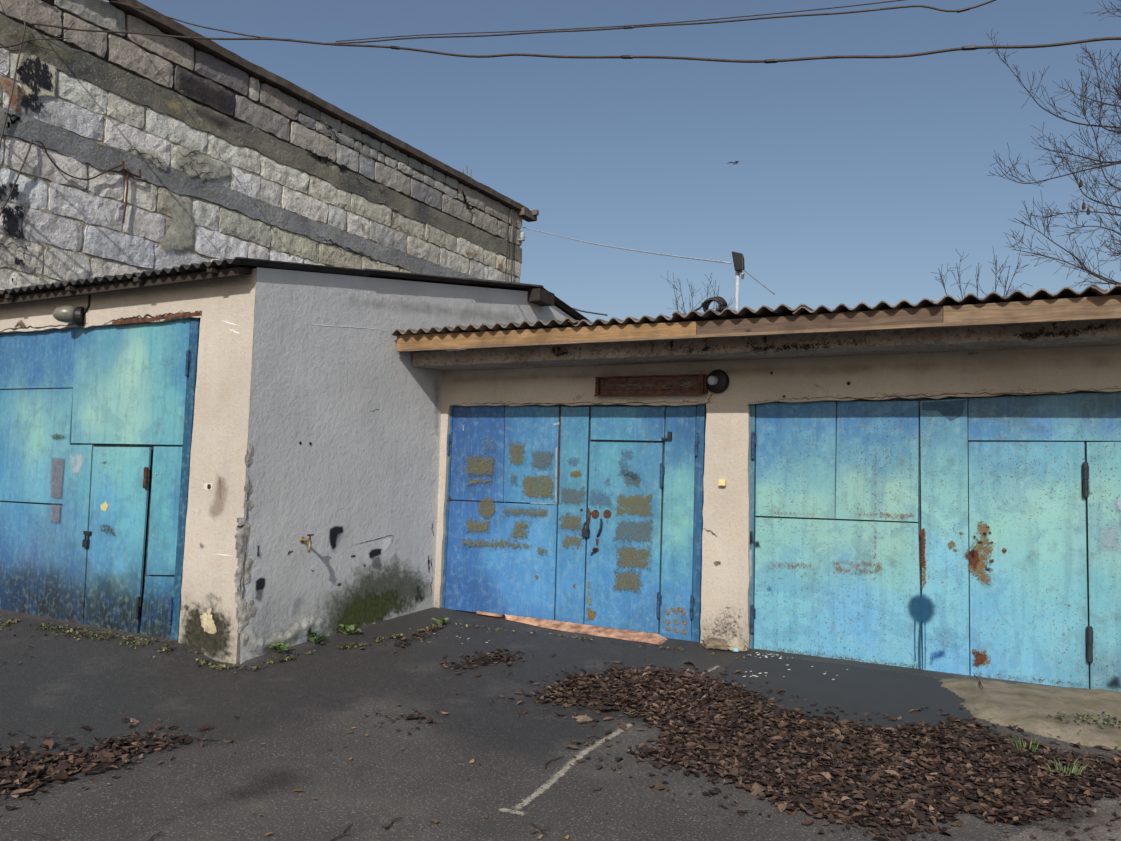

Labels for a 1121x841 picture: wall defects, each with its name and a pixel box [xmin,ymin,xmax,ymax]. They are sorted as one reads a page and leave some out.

peeling [0,53,57,113]
peeling [0,180,25,238]
spalling [234,443,257,646]
corrosion [948,521,1007,586]
water stain [302,549,425,642]
water stain [182,606,229,659]
corrosion [972,649,991,667]